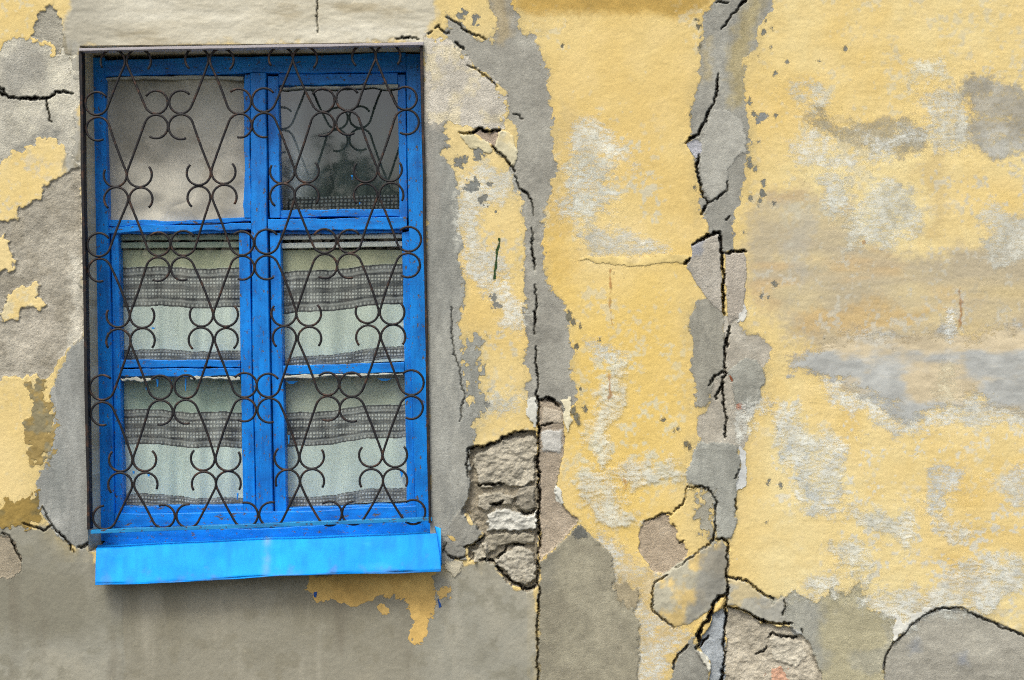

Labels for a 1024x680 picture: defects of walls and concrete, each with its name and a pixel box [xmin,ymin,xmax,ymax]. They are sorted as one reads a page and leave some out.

crack [396,17,496,85]
spalling [455,7,481,27]
crack [0,88,73,122]
spalling [748,96,778,125]
peeling [686,139,702,158]
spalling [746,156,777,207]
spalling [0,4,84,469]
crack [685,78,746,437]
crack [442,114,557,679]
spalling [435,332,839,680]
crack [651,472,803,680]
crack [884,607,1022,670]